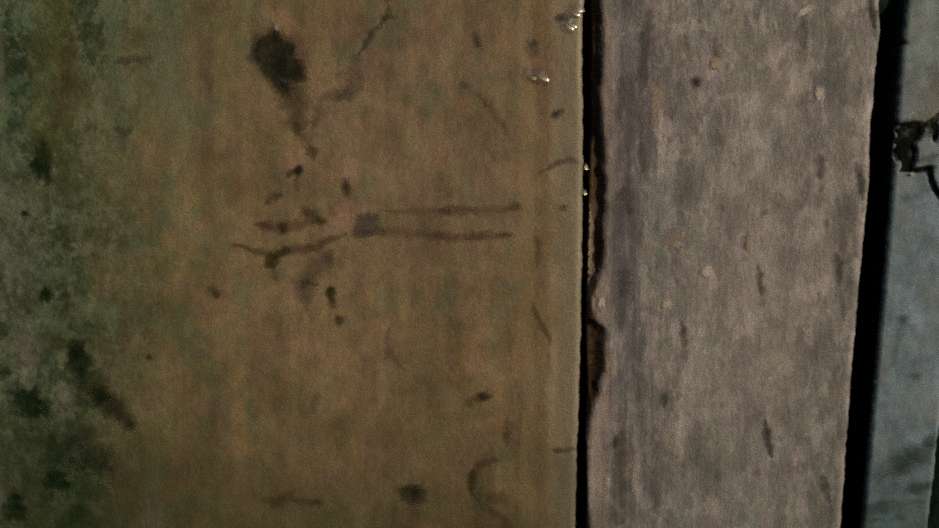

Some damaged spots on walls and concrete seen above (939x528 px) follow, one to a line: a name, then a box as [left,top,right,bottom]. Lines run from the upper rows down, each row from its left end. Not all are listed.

damp [253,34,303,92]
crack [899,113,939,140]
crack [913,166,939,198]
damp [68,341,93,374]